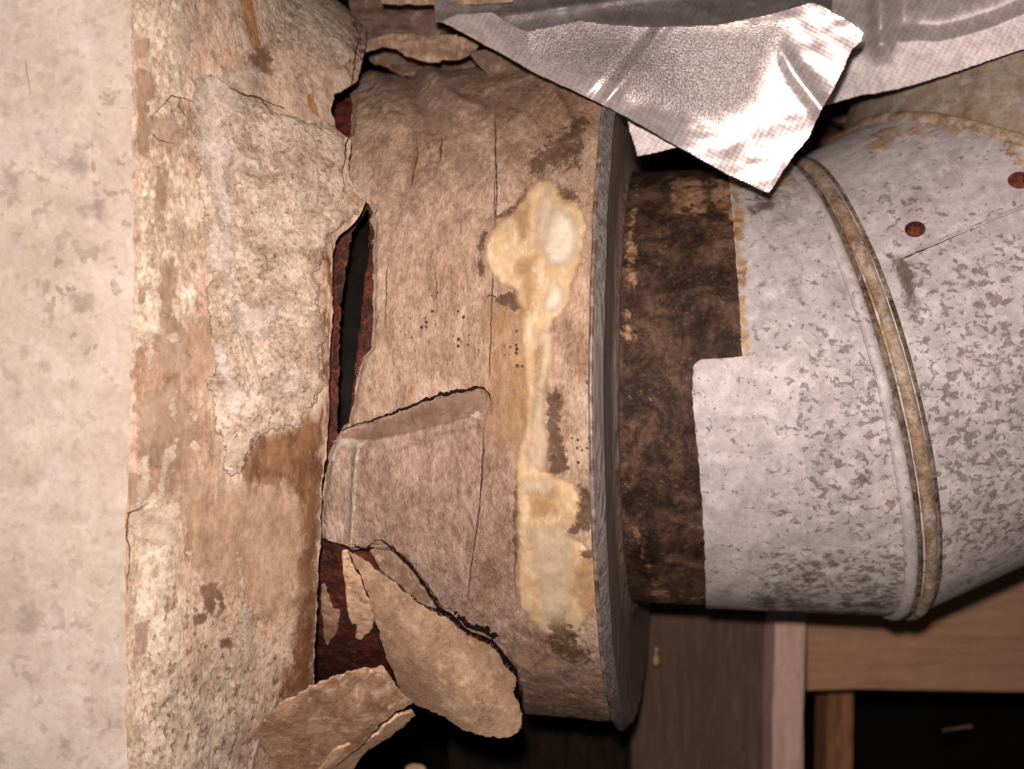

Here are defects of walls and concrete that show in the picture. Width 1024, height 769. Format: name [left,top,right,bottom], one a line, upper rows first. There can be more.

peeling [221,0,253,54]
peeling [147,97,159,117]
crack [492,124,500,221]
peeling [166,298,183,344]
peeling [192,65,360,495]
damp [477,115,595,668]
peeling [129,438,201,560]
crack [342,273,524,702]
peeling [318,549,523,769]